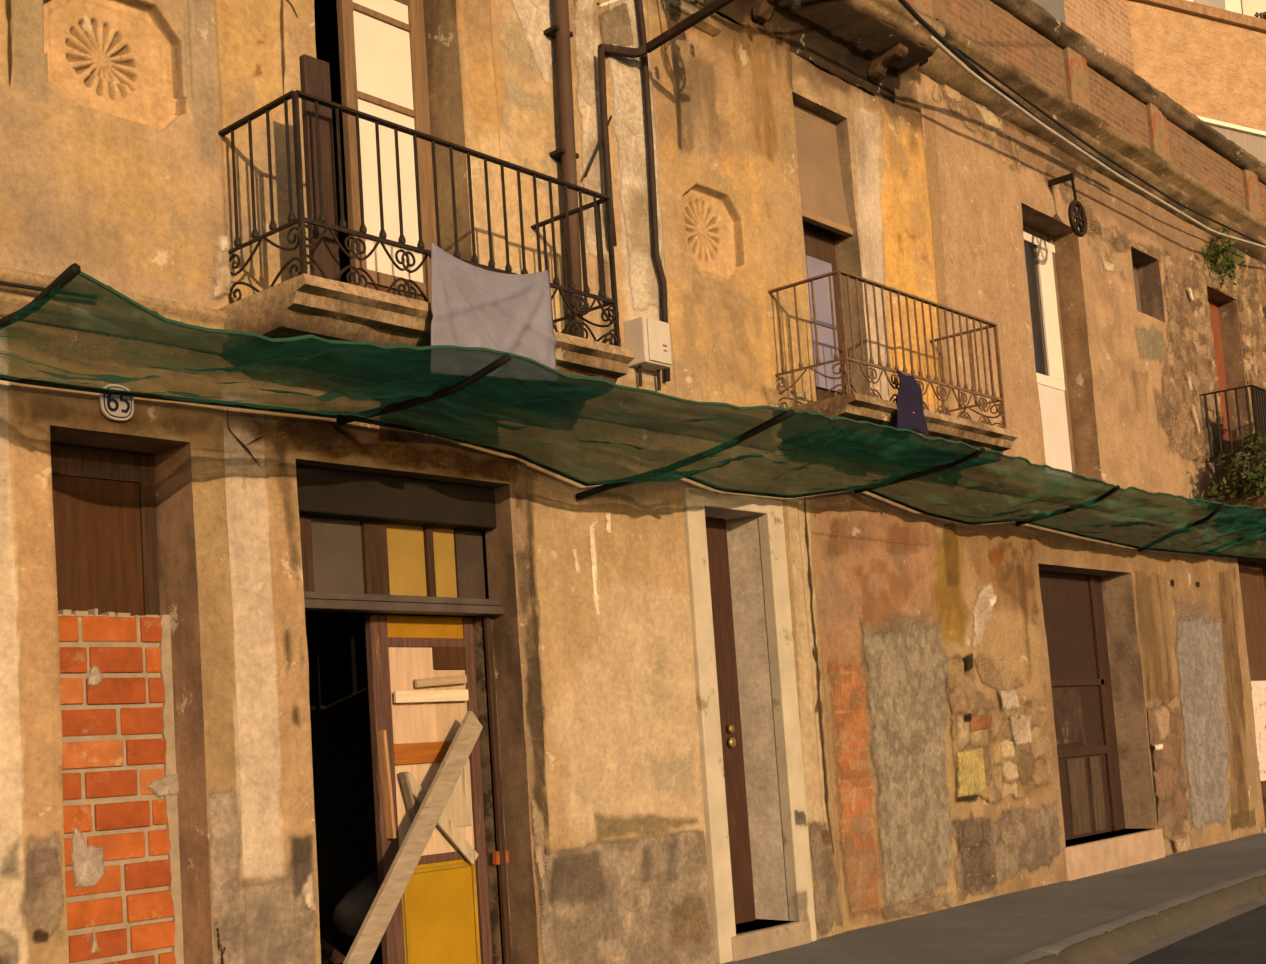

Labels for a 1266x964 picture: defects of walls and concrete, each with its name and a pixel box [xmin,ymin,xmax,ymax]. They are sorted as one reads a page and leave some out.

flaking render [504,0,556,84]
flaking render [575,0,662,340]
spalling [933,84,1266,463]
crack [227,407,264,468]
damp [529,522,538,641]
spalling [945,584,1053,803]
damp [537,815,716,964]
spalling [829,661,880,917]
damp [952,802,1061,900]